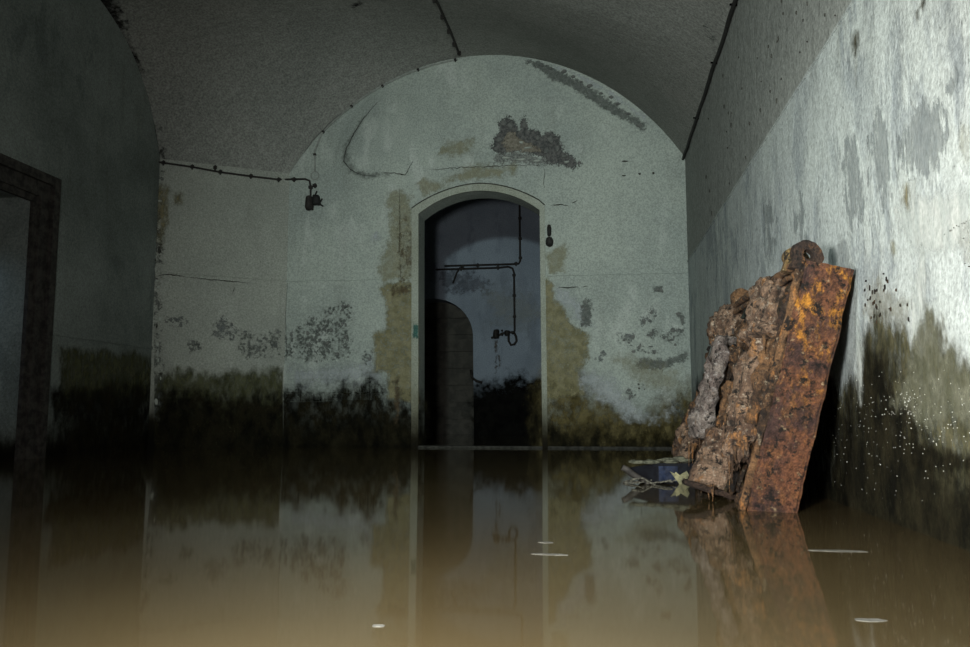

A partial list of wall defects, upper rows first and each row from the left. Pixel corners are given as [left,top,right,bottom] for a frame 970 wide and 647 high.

spalling [490,115,583,172]
peeling [212,301,353,362]
leakage [296,192,412,401]
leakage [546,248,641,421]
peeling [621,308,687,370]
leakage [895,179,970,429]